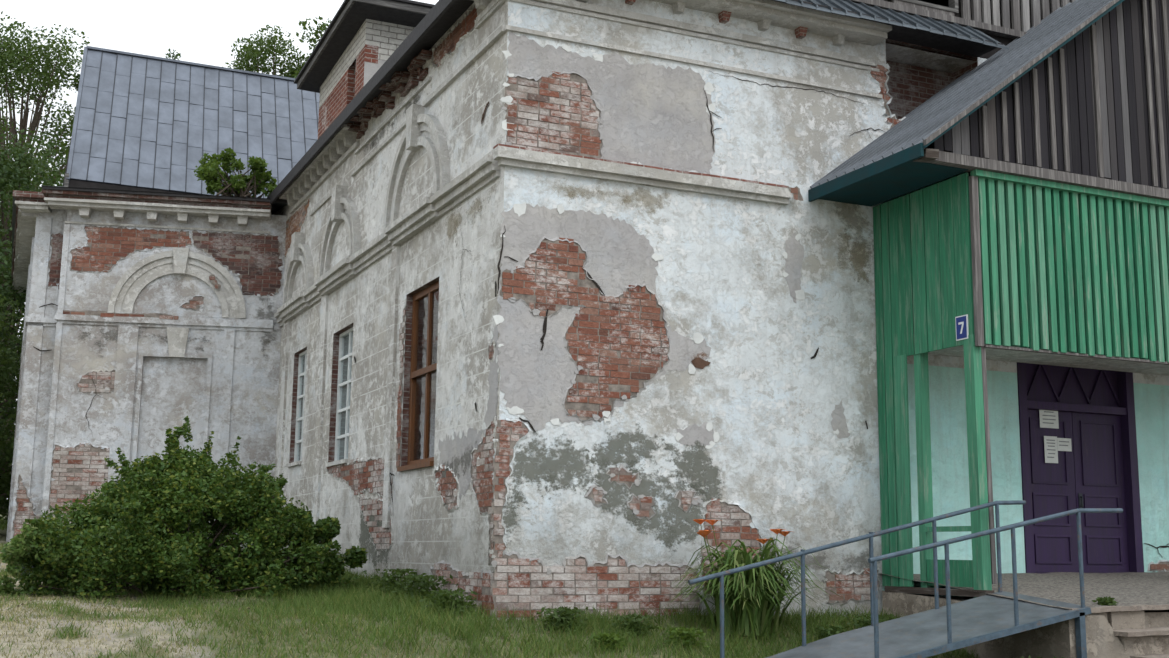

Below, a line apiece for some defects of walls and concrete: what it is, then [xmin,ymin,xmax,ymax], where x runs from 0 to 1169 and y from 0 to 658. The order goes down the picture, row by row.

spalling [430,5,480,70]
peeling [500,32,716,174]
spalling [47,197,312,298]
spalling [63,295,205,320]
spalling [75,368,115,396]
spalling [324,308,406,556]
peeling [430,202,764,620]
spalling [12,442,110,538]
leakage [502,423,722,551]
spalling [1147,560,1169,572]